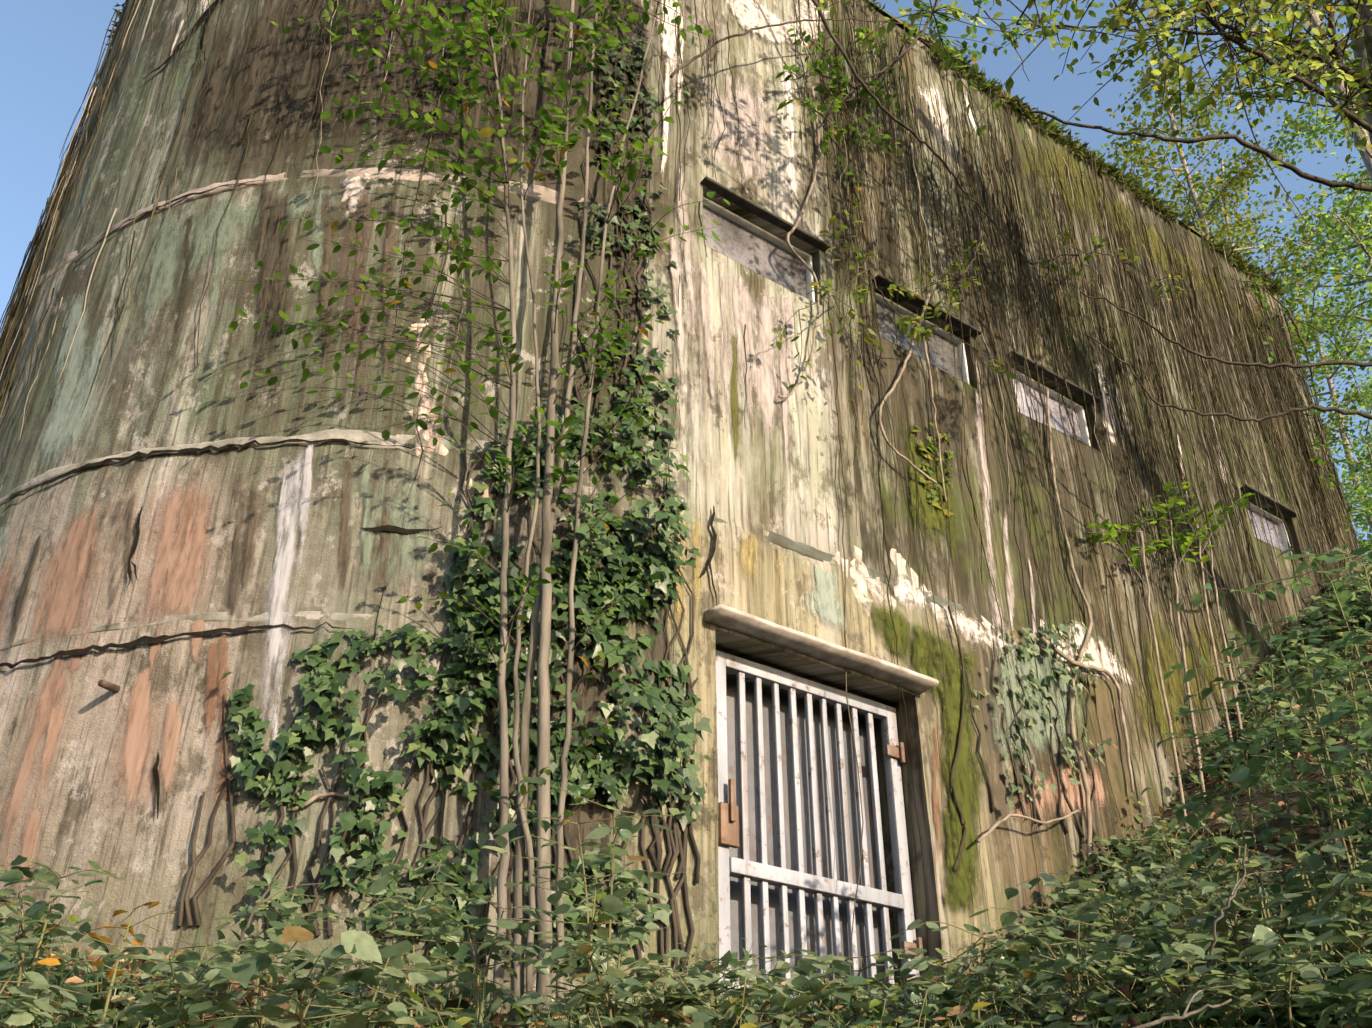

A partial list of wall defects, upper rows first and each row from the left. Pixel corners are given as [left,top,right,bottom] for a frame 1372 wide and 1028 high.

damp [919,87,951,153]
damp [1098,365,1116,441]
crack [0,622,352,669]
corrosion [126,486,229,802]
damp [268,446,313,679]
damp [976,363,1018,732]
damp [1028,560,1040,650]
corrosion [6,507,98,890]
damp [942,699,950,790]